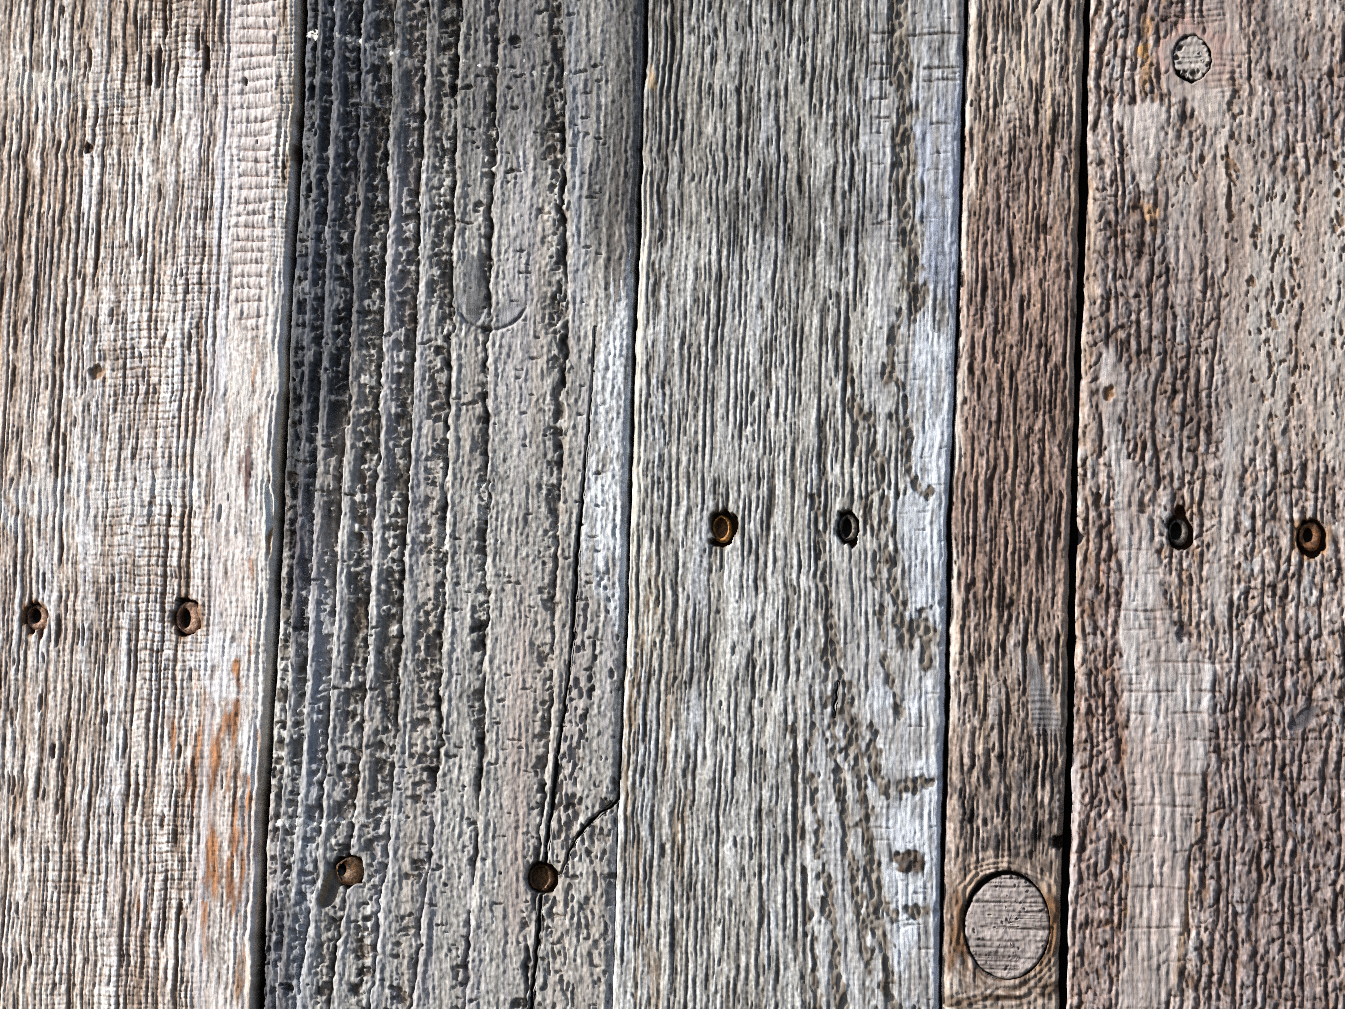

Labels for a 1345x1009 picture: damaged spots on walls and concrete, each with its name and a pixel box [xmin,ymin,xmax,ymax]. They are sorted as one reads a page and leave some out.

rust [186,657,252,932]
crack [528,327,620,1009]
rust [235,947,245,1002]